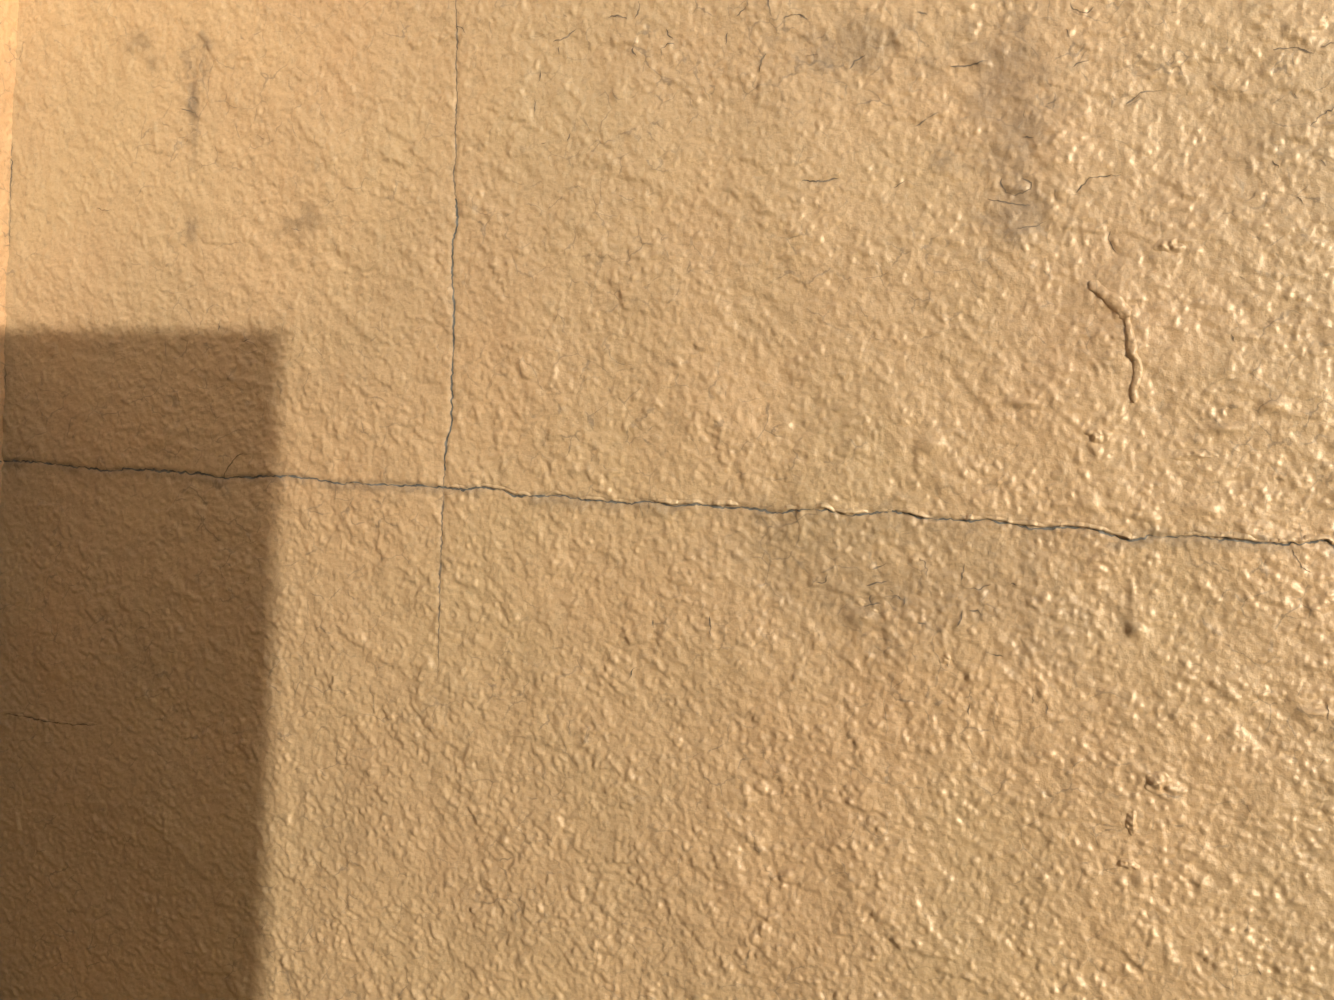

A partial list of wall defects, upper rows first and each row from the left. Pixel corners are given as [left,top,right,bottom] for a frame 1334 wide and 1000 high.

crack [0,0,1334,677]